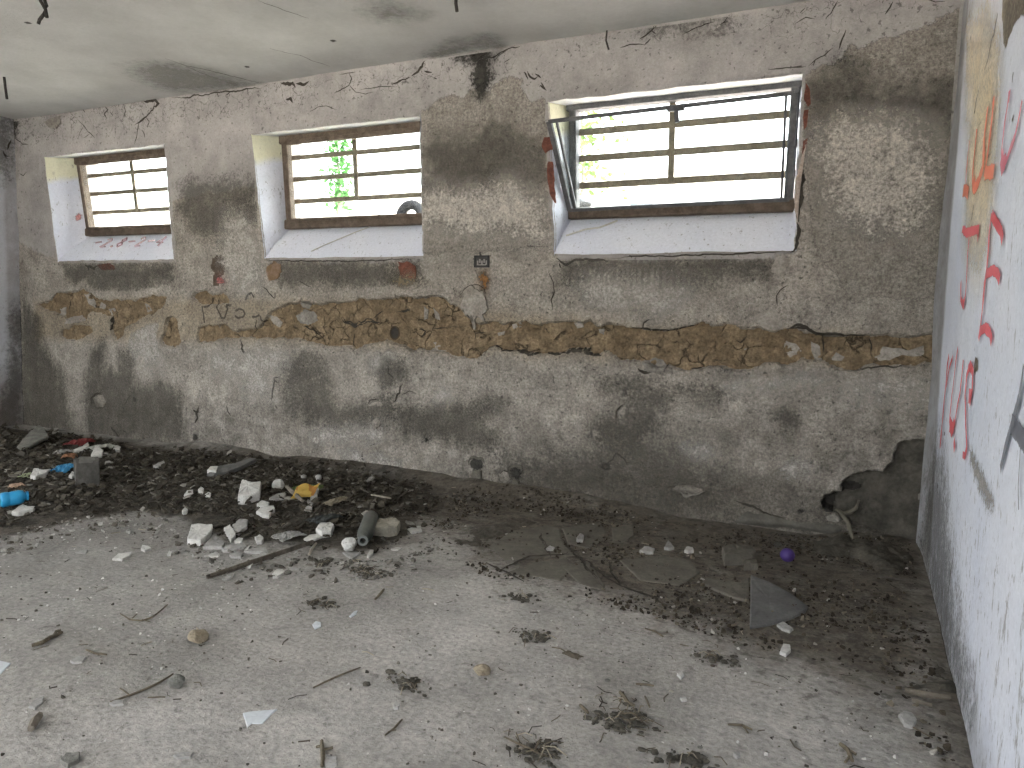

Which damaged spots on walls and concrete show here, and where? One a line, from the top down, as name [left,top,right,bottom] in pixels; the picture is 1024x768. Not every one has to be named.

crack [70,103,155,145]
damp [422,123,550,245]
damp [177,174,422,293]
flaking render [60,293,116,324]
damp [84,324,182,441]
flaking render [296,301,318,325]
flaking render [460,269,489,330]
flaking render [754,309,844,361]
flaking render [875,345,924,361]
damp [212,351,743,516]
spalling [821,439,925,540]